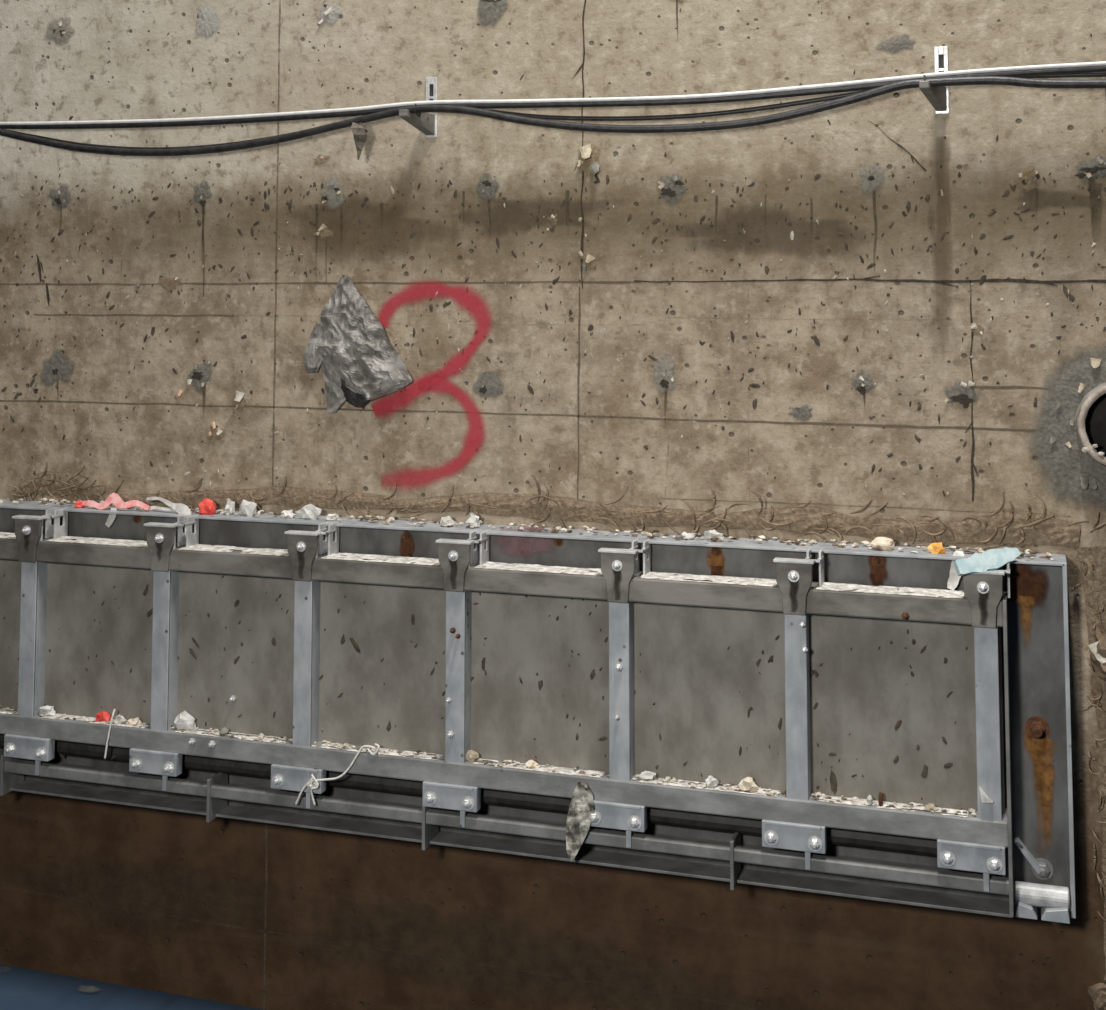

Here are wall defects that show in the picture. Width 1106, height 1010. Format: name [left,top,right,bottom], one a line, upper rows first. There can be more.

rust [708,540,724,576]
rust [869,548,887,586]
rust [1024,732,1054,829]